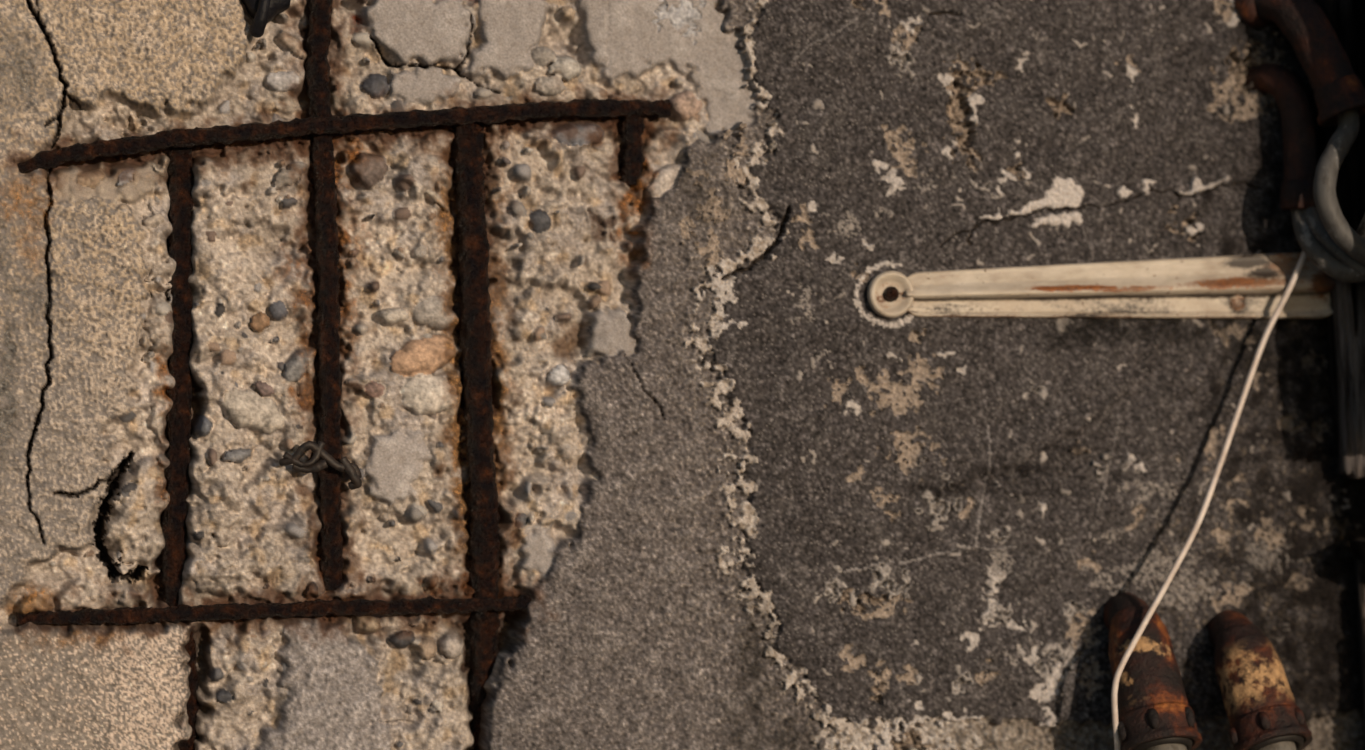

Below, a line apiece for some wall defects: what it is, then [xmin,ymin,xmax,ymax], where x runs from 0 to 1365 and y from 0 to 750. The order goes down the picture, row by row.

peeling [852,0,924,79]
spalling [873,54,1032,221]
crack [26,0,149,585]
rust [155,356,171,406]
spalling [0,0,821,750]
rust [617,160,648,236]
crack [721,207,791,281]
peeling [825,252,957,418]
crack [940,176,1277,261]
rust [453,423,469,513]
peeling [871,427,976,532]
spalling [717,453,1121,750]